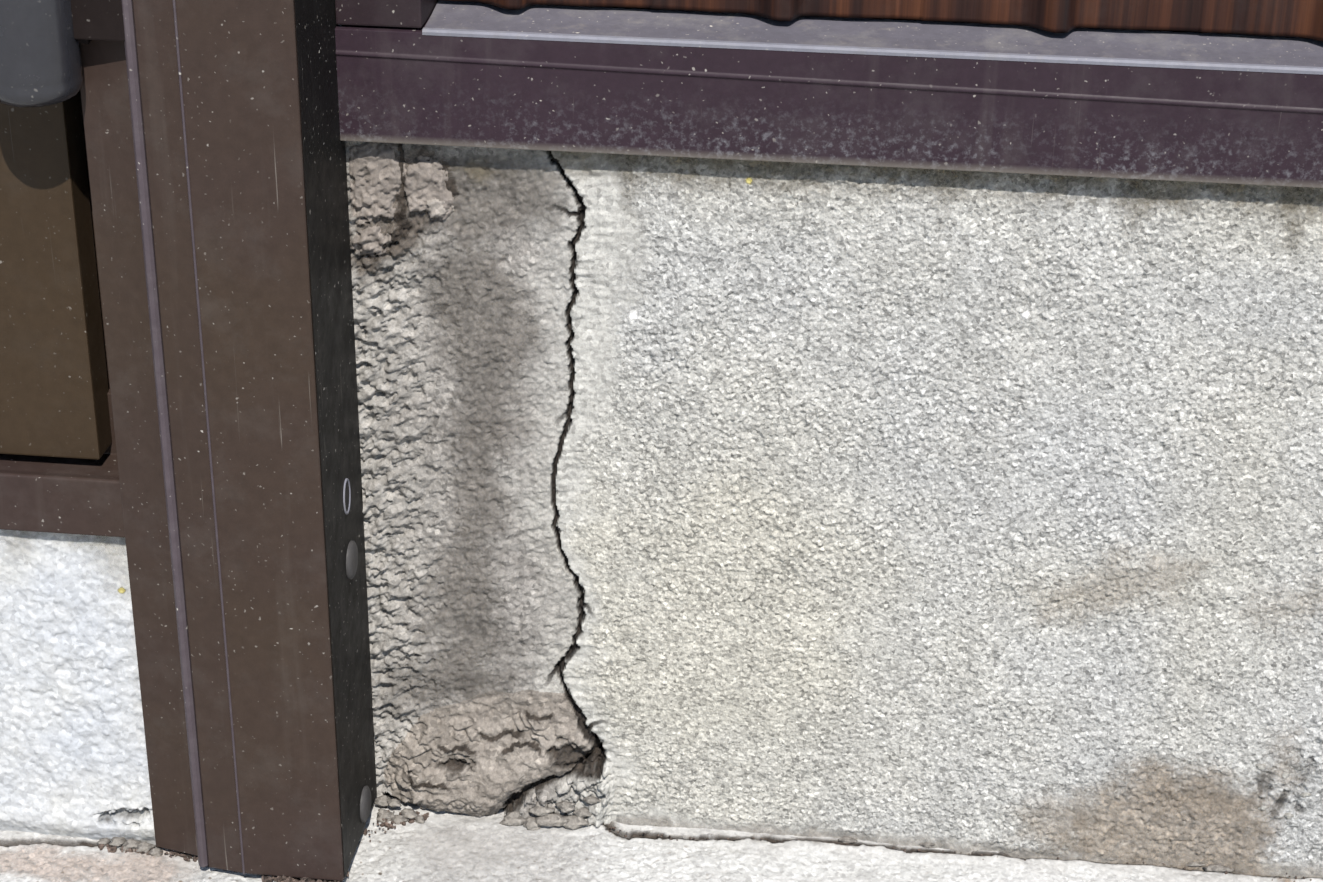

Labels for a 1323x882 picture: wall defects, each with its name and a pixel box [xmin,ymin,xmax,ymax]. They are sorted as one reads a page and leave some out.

peeling [349,142,458,274]
damp [435,256,527,696]
crack [499,151,1308,879]
crack [0,840,122,848]
crack [374,792,425,825]
damp [1075,765,1269,874]